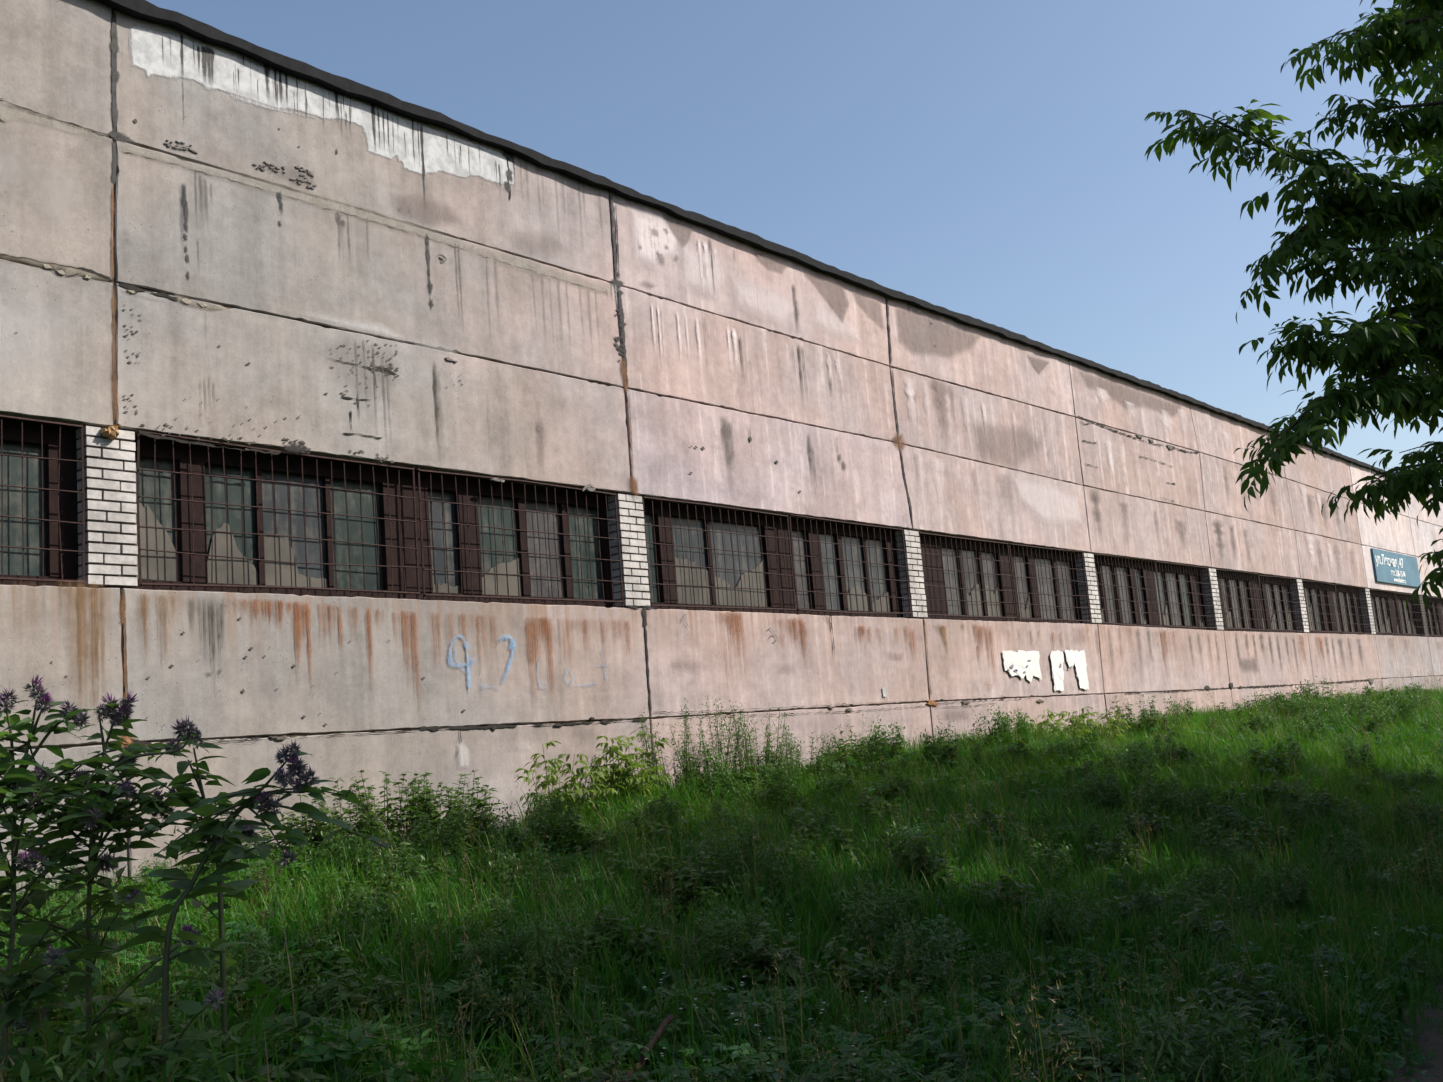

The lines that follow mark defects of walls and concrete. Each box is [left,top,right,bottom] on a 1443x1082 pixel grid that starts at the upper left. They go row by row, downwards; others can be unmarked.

crack [0,98,109,138]
peeling [113,26,516,189]
crack [0,254,111,278]
damp [182,184,207,279]
damp [611,197,721,387]
damp [809,275,852,333]
damp [320,317,398,422]
damp [728,330,743,366]
damp [1031,358,1048,373]
damp [887,299,976,524]
corrosion [256,601,320,656]
corrosion [911,626,946,707]